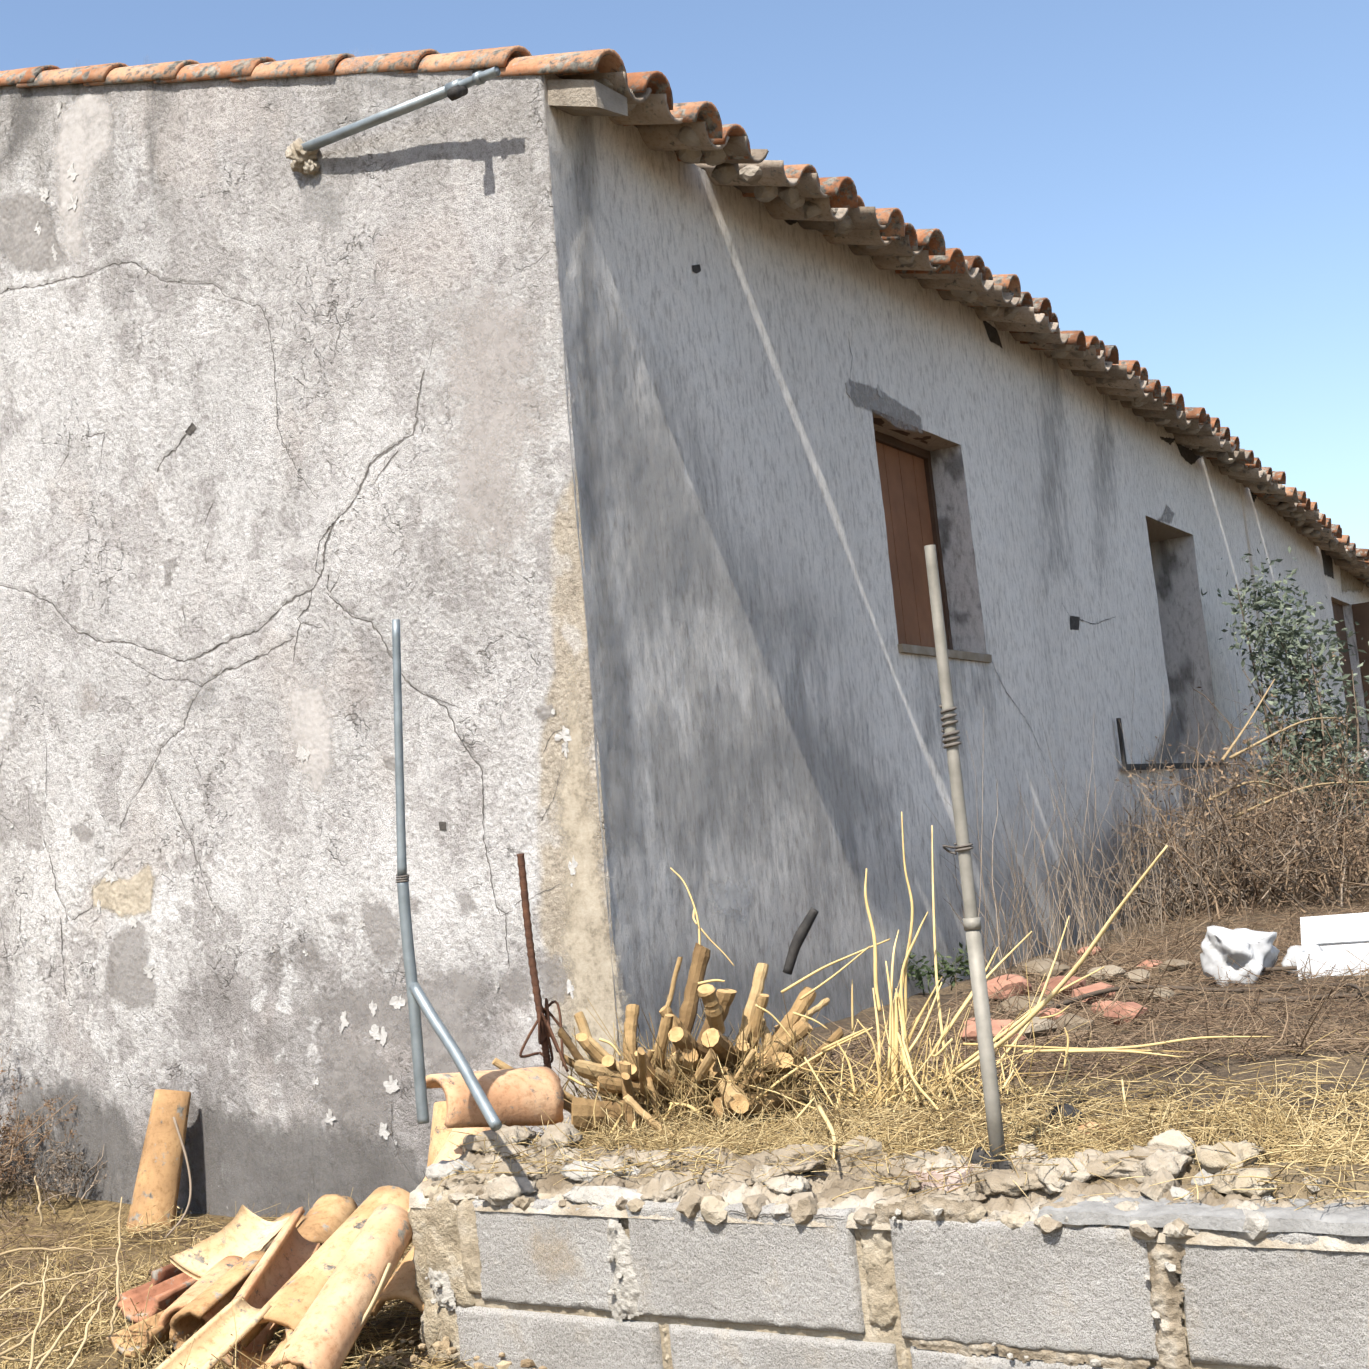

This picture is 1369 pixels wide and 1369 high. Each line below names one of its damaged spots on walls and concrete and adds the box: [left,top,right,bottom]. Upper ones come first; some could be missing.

peeling [92,865,155,1007]
crack [0,261,614,987]
peeling [309,667,624,1140]
leakage [1157,707,1184,763]